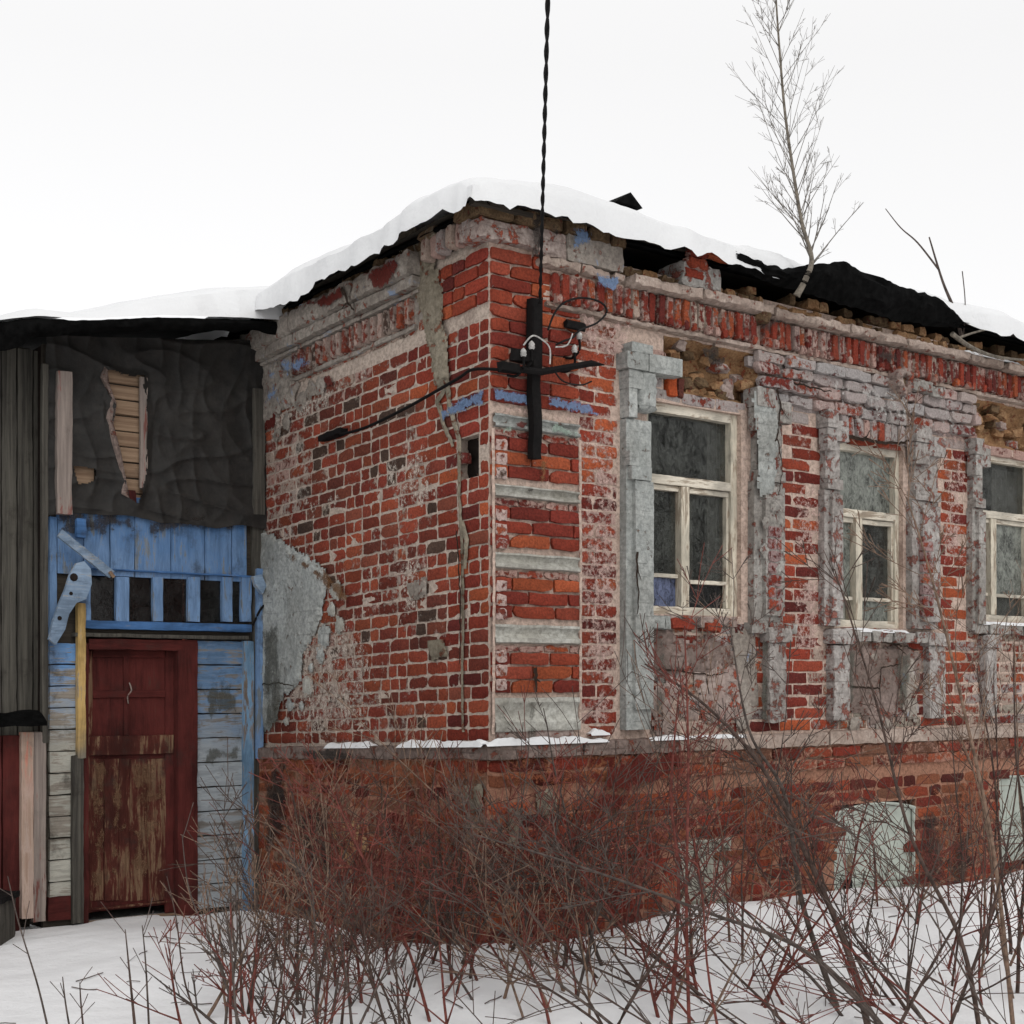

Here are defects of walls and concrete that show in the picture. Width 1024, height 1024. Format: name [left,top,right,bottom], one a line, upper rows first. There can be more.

flaking render [307,287,344,307]
flaking render [367,260,398,288]
crack [398,227,469,732]
spalling [663,336,781,529]
spalling [973,400,1024,452]
flaking render [261,530,344,732]
peeling [92,763,165,874]